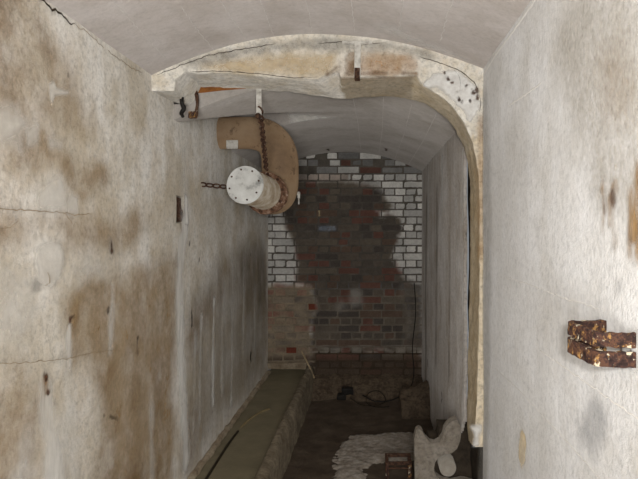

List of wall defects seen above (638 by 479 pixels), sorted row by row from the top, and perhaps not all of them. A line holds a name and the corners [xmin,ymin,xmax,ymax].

crack [42,0,142,73]
peeling [424,71,480,121]
crack [0,208,89,229]
crack [0,350,117,364]
damp [115,197,188,468]
rust [620,332,638,369]